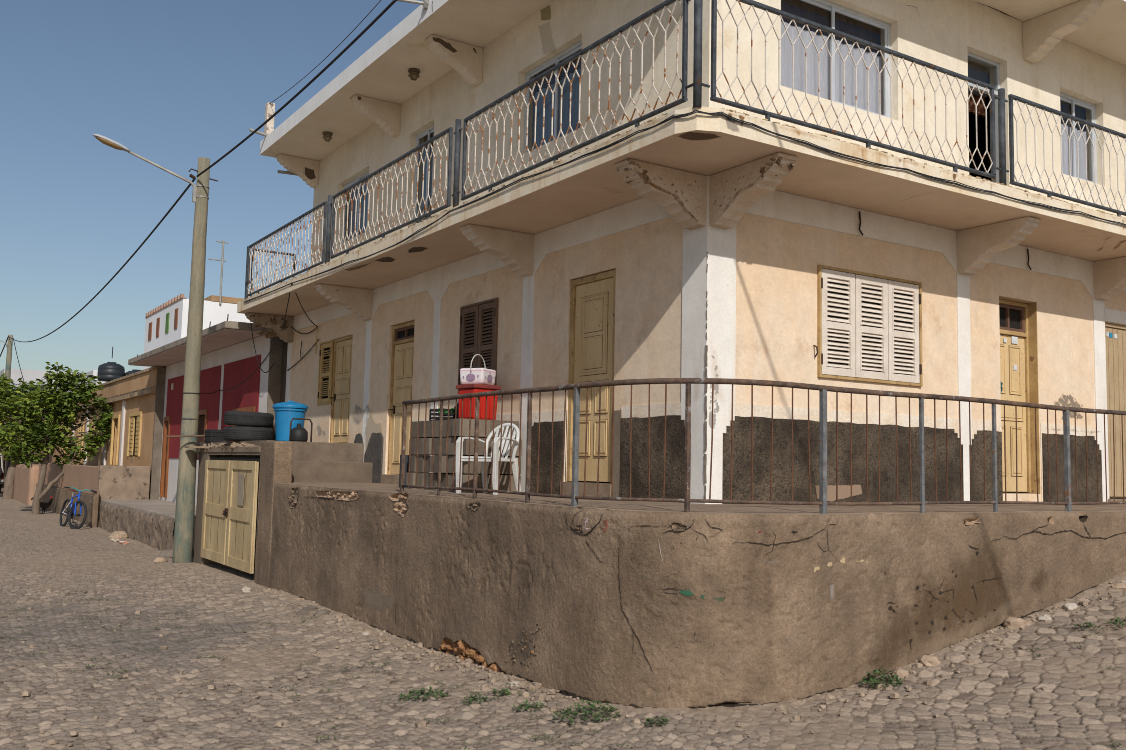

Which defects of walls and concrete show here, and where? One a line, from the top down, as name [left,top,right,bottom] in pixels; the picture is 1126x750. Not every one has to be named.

peeling [709,356,719,428]
crack [565,252,838,672]
spalling [316,491,358,501]
spalling [389,493,410,517]
crack [969,524,1126,549]
crack [350,611,482,665]
spalling [439,624,543,675]
crack [761,577,1099,705]
crack [509,674,657,708]